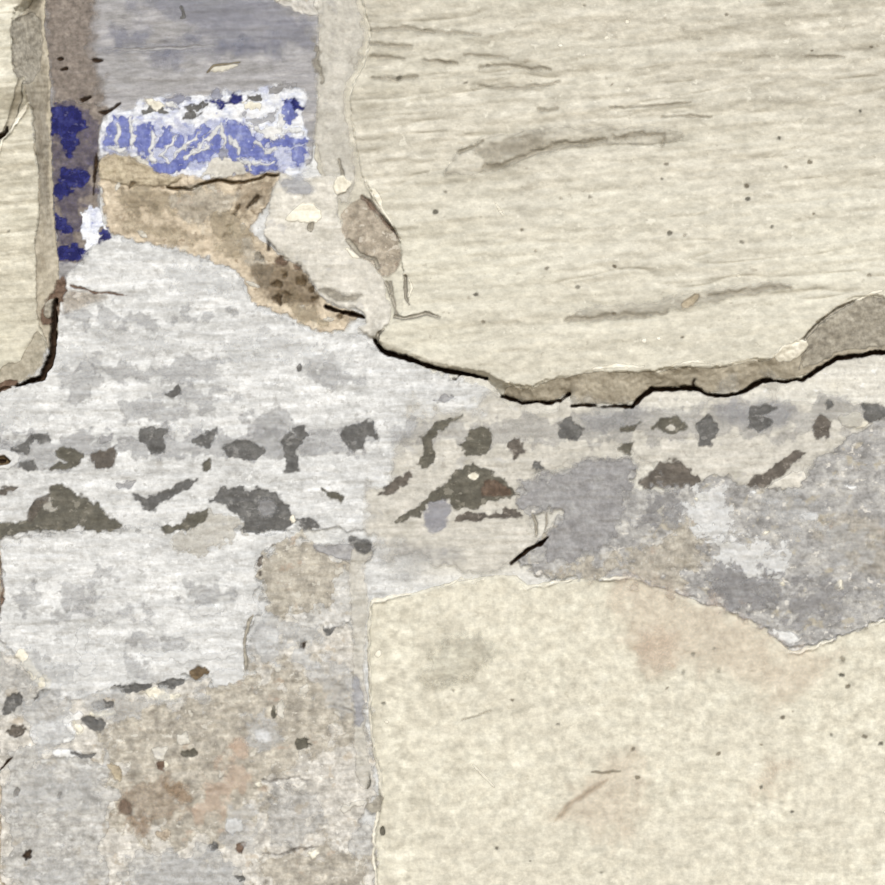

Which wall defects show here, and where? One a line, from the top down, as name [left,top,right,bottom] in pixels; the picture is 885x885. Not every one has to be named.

crack [0,77,30,151]
peeling [0,0,365,389]
crack [0,299,58,392]
crack [374,275,488,380]
crack [501,301,885,409]
peeling [0,101,491,885]
crack [510,514,548,565]
spalling [365,290,885,654]